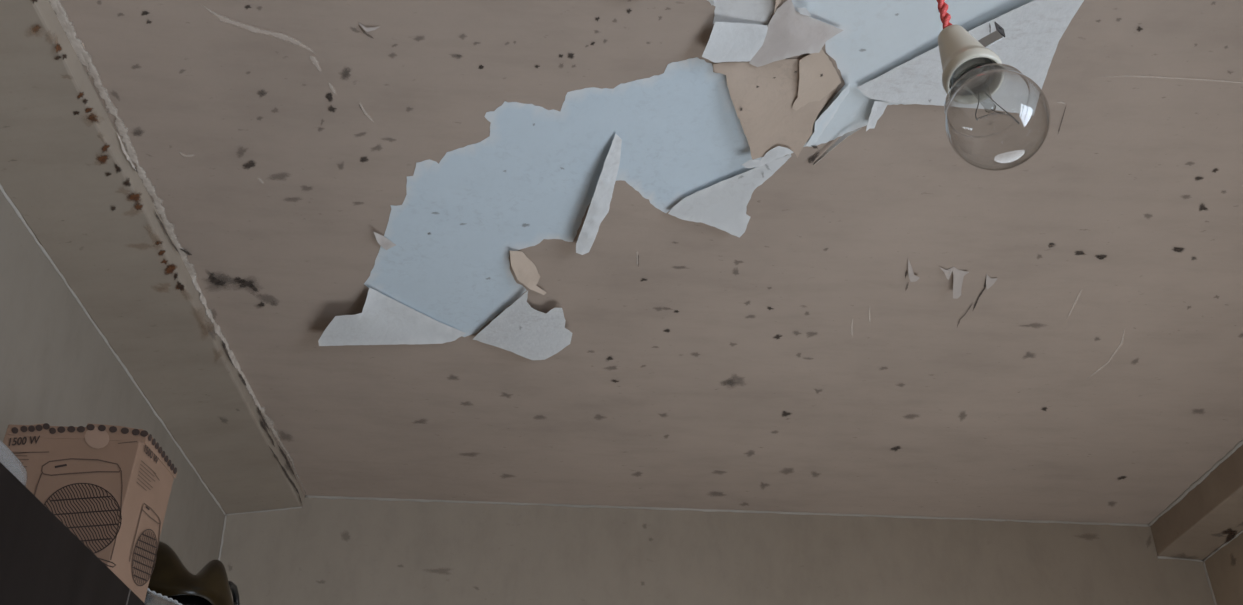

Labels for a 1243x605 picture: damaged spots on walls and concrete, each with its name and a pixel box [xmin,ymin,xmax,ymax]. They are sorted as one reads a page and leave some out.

water stain [209,274,264,306]
peeling [318,0,1084,360]